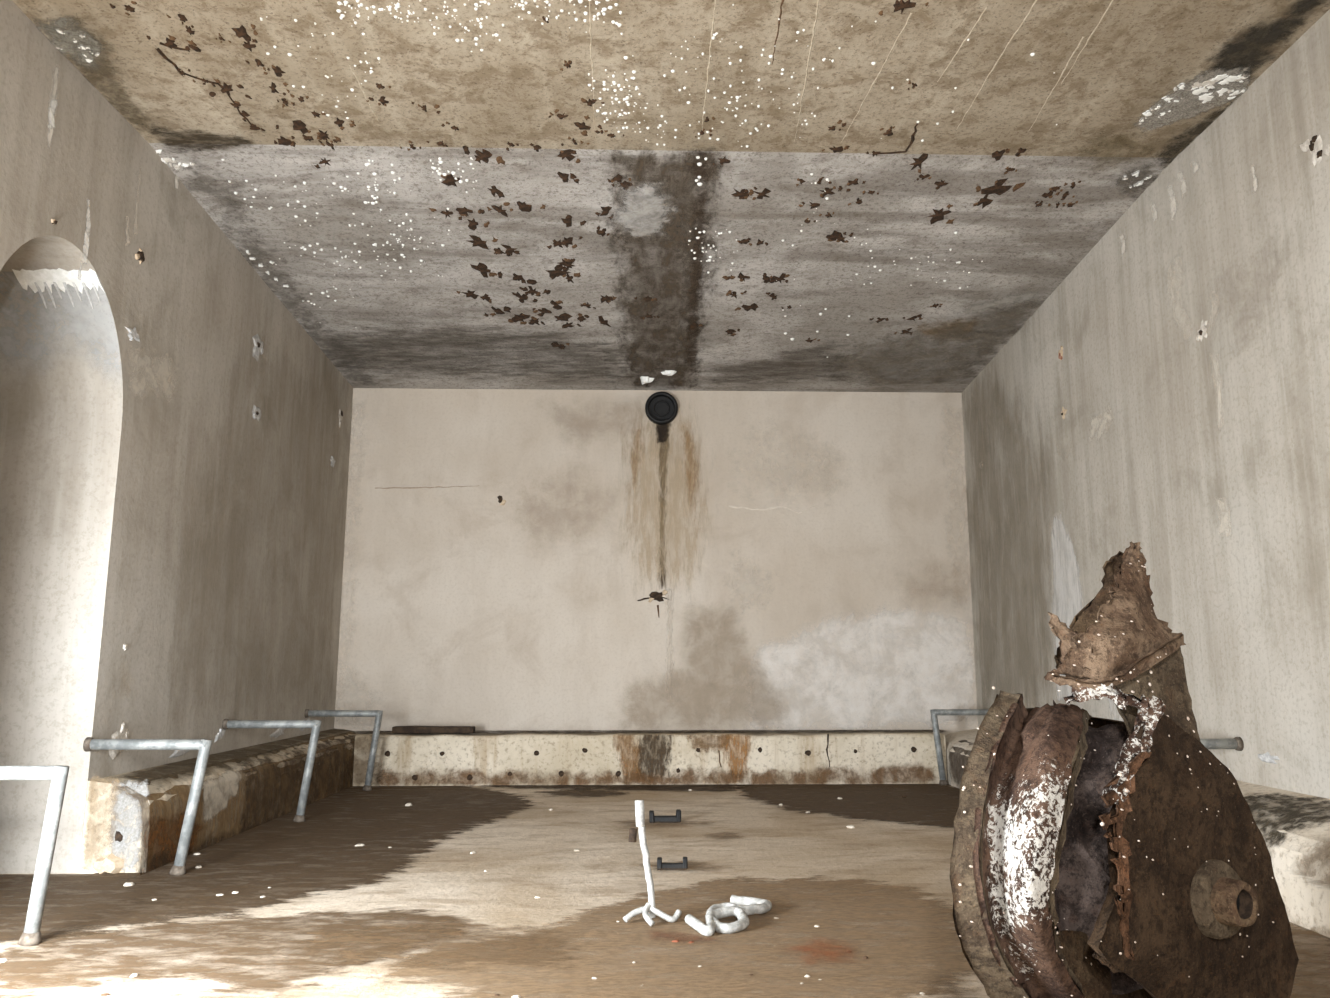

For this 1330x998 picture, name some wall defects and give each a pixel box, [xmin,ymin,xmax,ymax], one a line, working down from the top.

leakage [1116,0,1325,220]
leakage [0,200,177,398]
leakage [611,151,723,388]
corrosion [656,424,670,587]
leakage [1052,515,1082,654]
leakage [464,611,973,734]
leakage [1057,674,1072,700]
leakage [0,675,974,998]
corrosion [616,734,671,782]
corrosion [689,734,749,783]
leakage [1244,793,1330,847]
leakage [1290,922,1330,998]